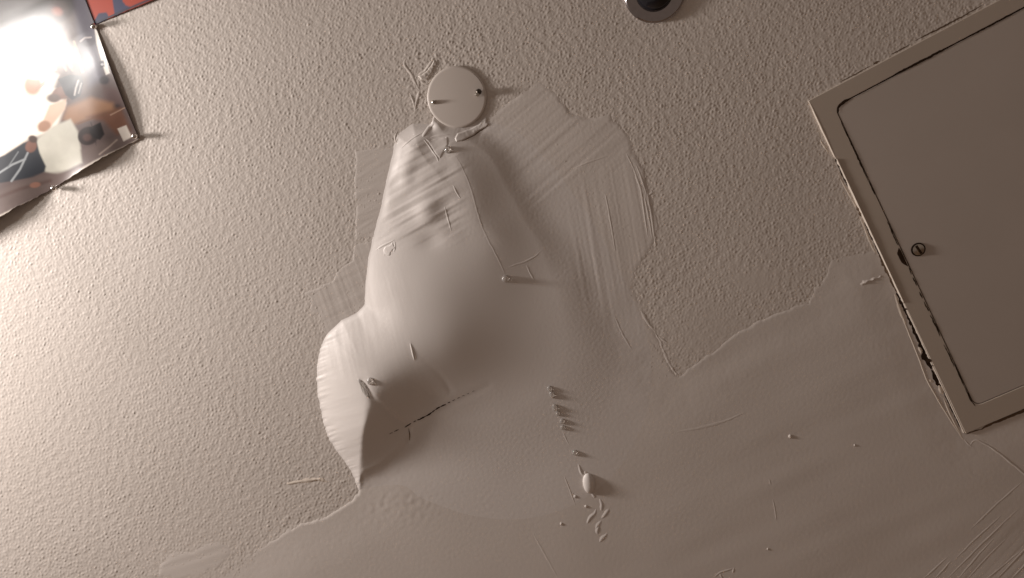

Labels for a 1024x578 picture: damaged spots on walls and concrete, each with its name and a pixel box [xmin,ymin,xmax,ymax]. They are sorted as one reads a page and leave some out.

crack [390,393,469,441]
crack [809,5,1024,440]